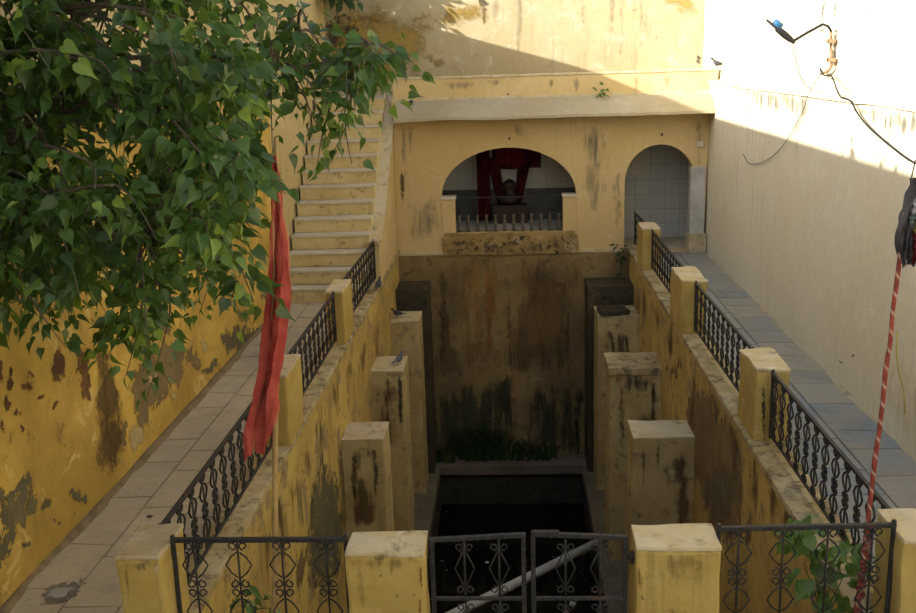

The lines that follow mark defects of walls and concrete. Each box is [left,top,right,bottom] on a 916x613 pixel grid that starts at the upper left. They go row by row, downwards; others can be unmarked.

damp [752,91,805,115]
damp [885,114,915,132]
damp [508,262,577,371]
flaking render [0,360,45,432]
flaking render [52,350,65,382]
flaking render [76,349,91,401]
damp [528,386,583,455]
peeling [0,471,52,569]
peeling [69,488,87,504]
damp [351,452,379,525]
damp [675,456,689,524]